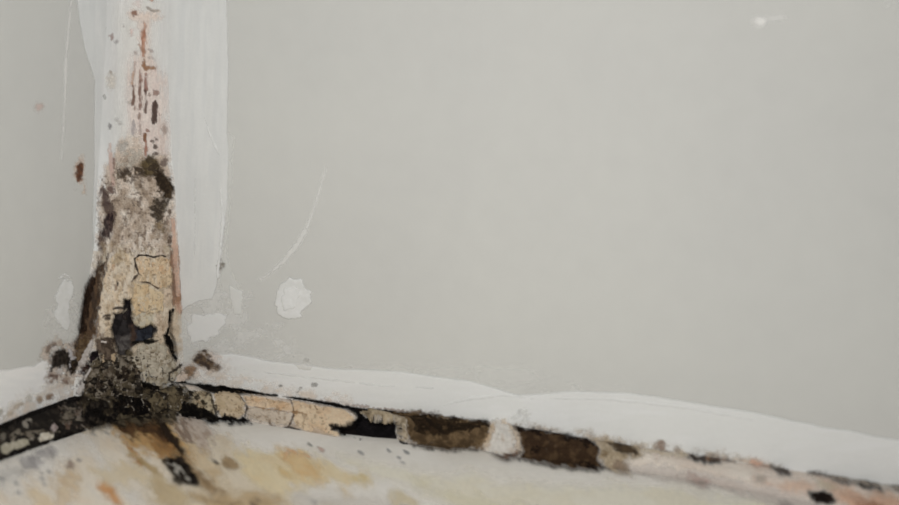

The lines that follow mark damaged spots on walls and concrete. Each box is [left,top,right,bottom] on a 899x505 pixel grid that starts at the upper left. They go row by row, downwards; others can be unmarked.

corrosion [127,0,170,158]
corrosion [75,158,84,182]
water stain [72,118,179,350]
peeling [51,244,242,394]
crack [115,249,437,430]
peeling [0,418,58,455]
peeling [192,390,409,445]
water stain [0,349,836,505]
peeling [483,418,522,460]